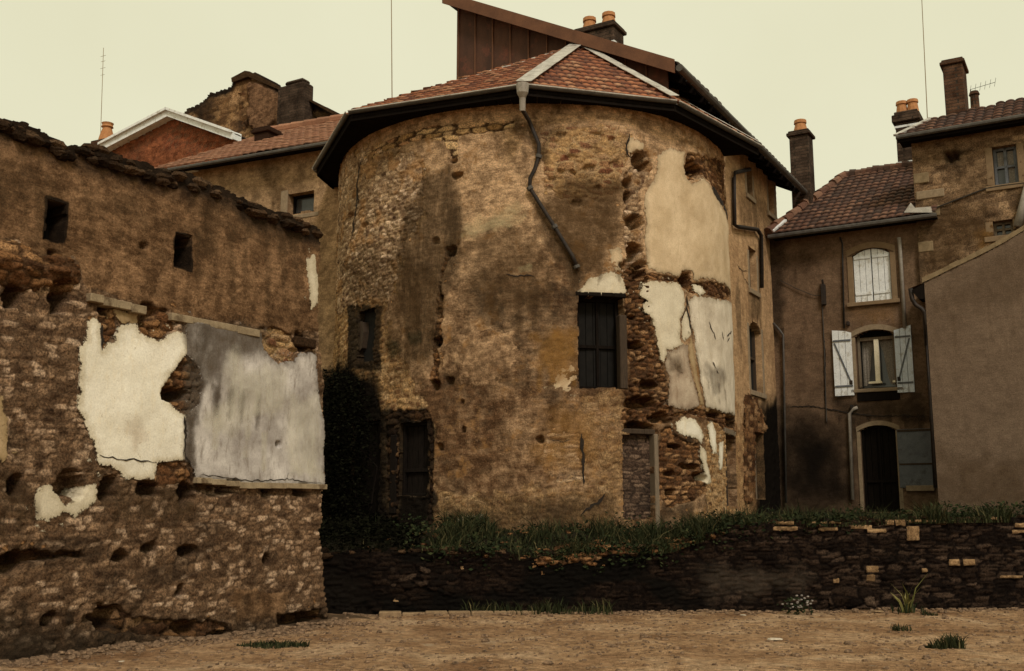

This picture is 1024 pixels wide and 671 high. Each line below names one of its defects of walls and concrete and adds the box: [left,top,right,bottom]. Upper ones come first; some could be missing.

peeling [0,396,18,462]
peeling [26,302,325,531]
leakage [166,322,262,461]
leakage [400,167,459,358]
crack [549,433,605,515]
peeling [534,122,768,511]